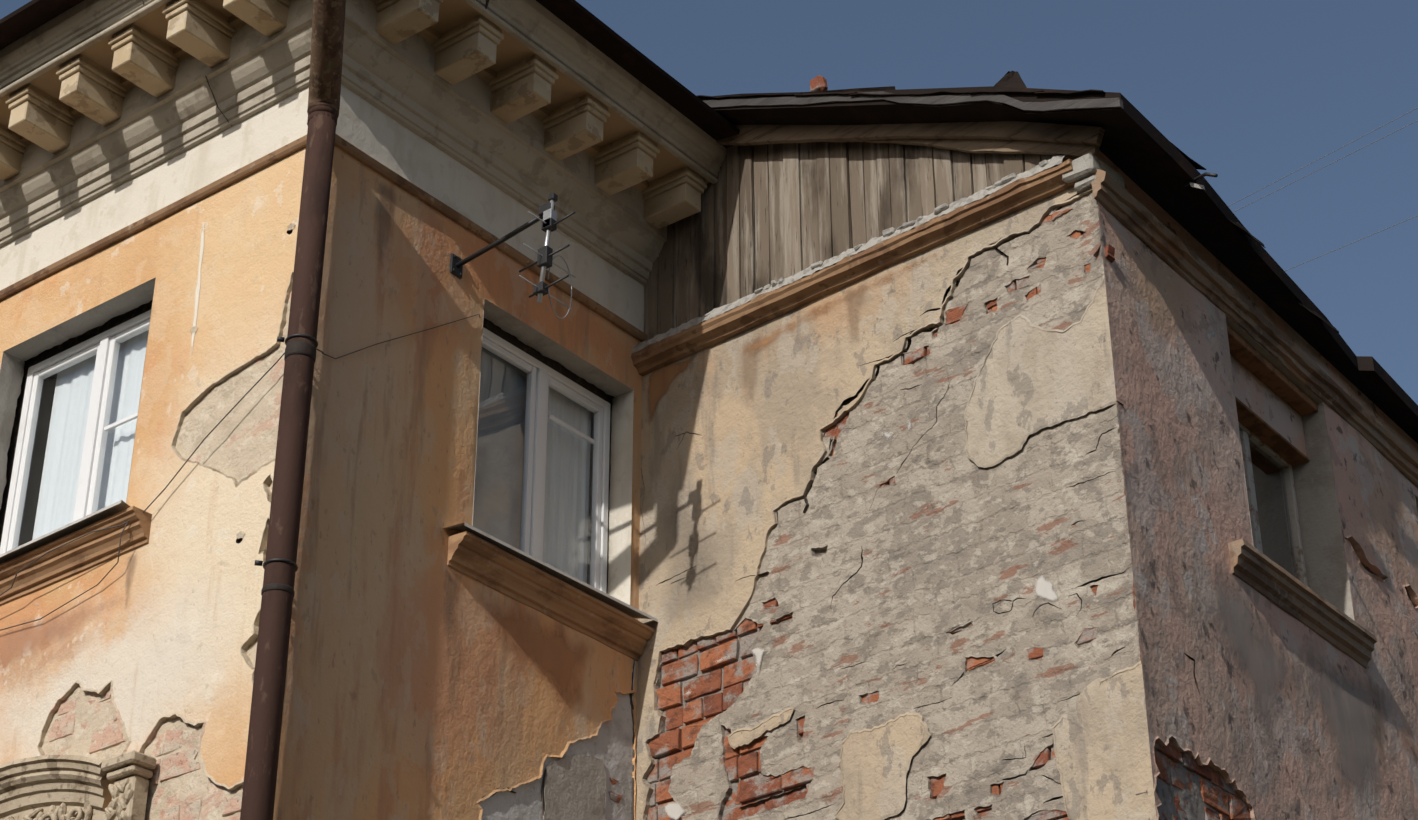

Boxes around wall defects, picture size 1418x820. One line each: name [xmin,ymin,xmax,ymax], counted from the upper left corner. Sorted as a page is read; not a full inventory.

spalling [171,271,294,563]
spalling [476,188,1145,820]
crack [803,280,960,513]
crack [1071,401,1124,487]
spalling [240,607,261,684]
flaking render [37,680,244,820]
flaking render [1136,734,1256,820]